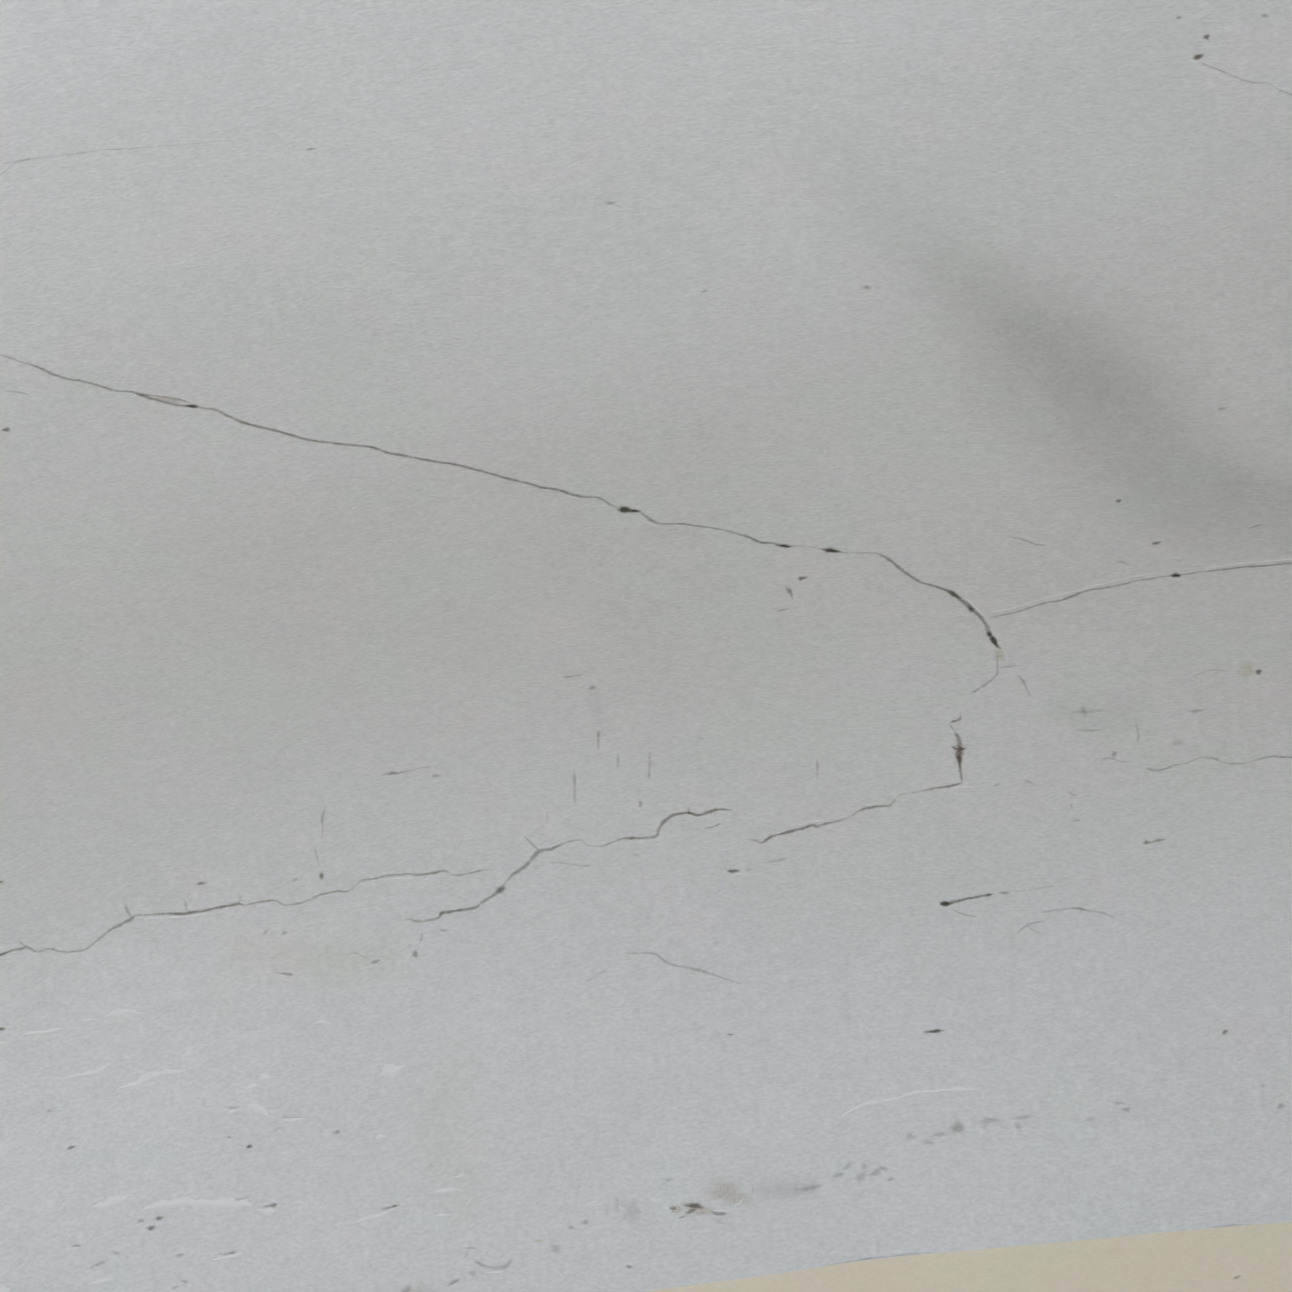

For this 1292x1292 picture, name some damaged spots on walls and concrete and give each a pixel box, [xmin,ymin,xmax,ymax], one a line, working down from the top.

crack [620,507,671,529]
crack [941,558,1292,646]
crack [953,721,974,789]
crack [142,906,222,919]